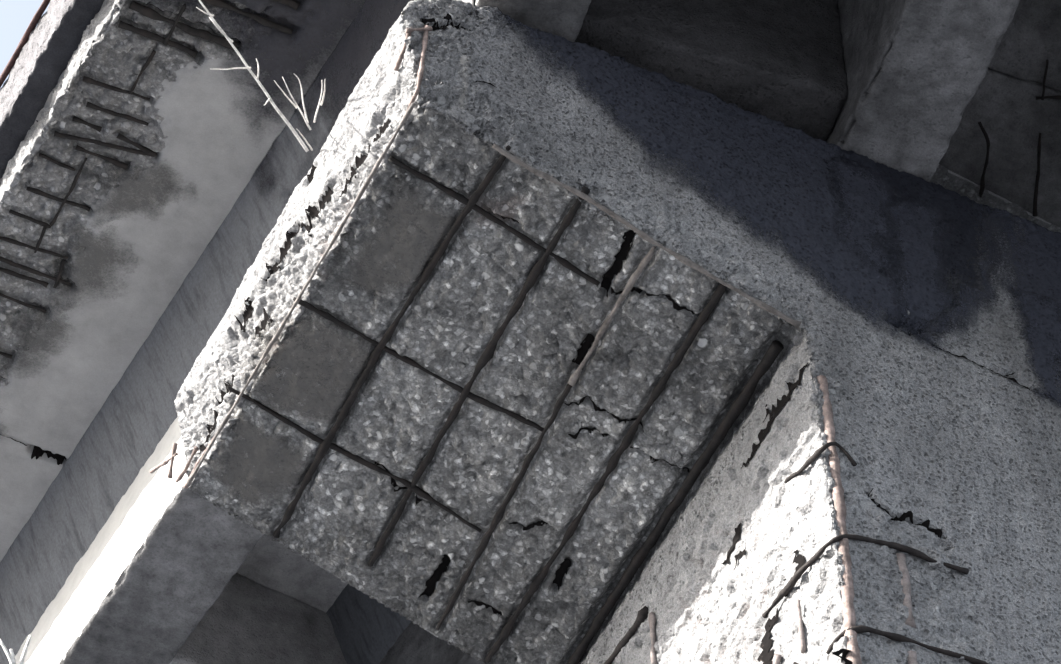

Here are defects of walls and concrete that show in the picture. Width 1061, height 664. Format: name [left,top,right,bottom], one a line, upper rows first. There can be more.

leakage [96,164,174,214]
spalling [0,0,293,386]
leakage [1,230,124,370]
spalling [149,0,997,664]
spalling [31,445,66,465]
crack [563,396,690,473]
crack [509,520,548,531]
crack [868,489,942,538]
crack [468,600,513,617]